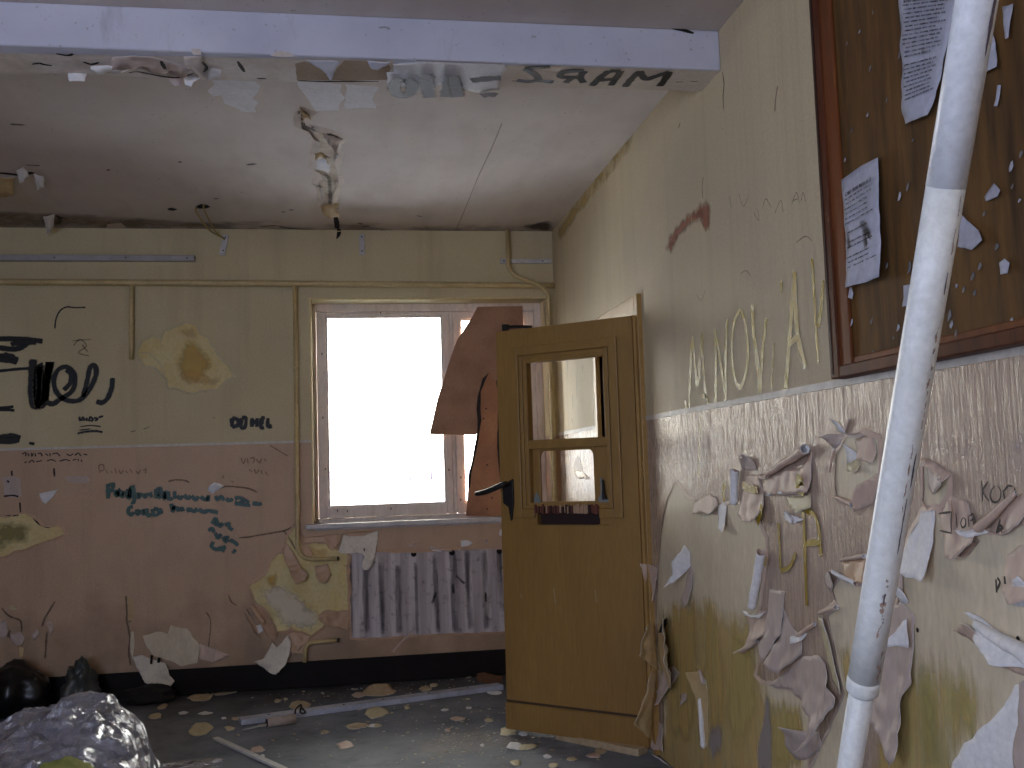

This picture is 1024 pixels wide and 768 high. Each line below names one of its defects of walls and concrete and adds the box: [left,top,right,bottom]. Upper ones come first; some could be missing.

peeling [0,49,719,219]
peeling [819,418,882,516]
peeling [132,625,230,686]
peeling [247,525,378,675]
peeling [634,444,867,768]
peeling [870,458,1024,768]